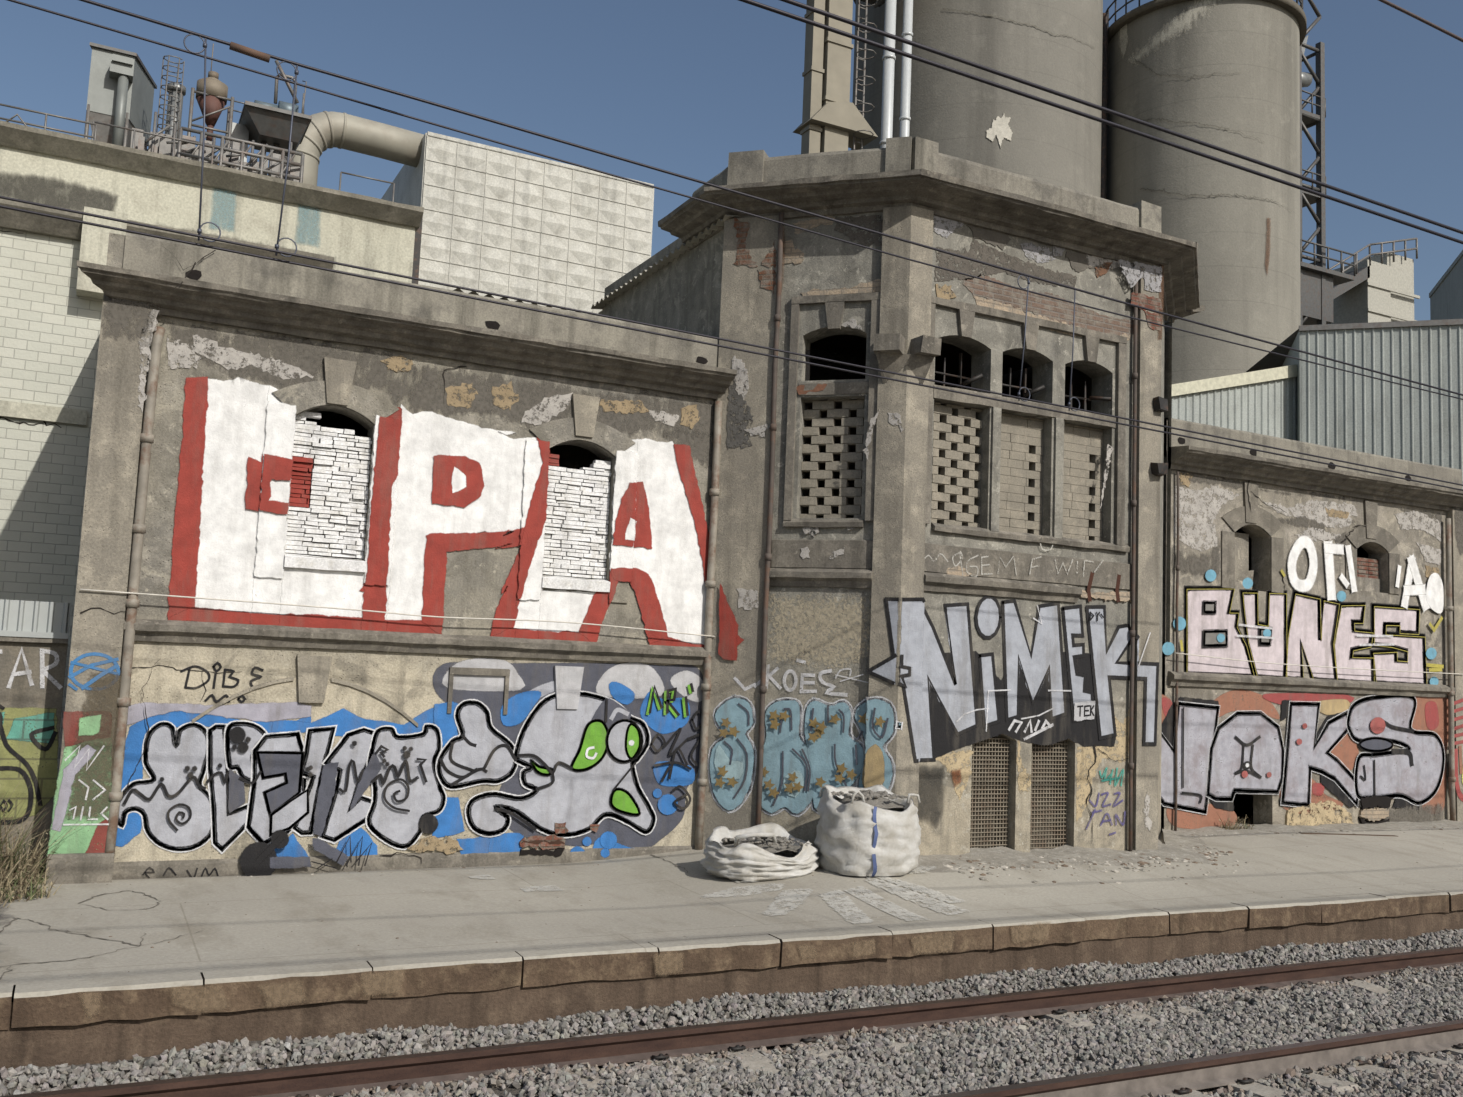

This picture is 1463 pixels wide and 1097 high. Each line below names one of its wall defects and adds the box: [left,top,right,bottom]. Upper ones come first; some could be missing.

peeling [986,113,1013,149]
flaking render [733,215,883,296]
peeling [933,215,1162,341]
spalling [841,319,862,330]
peeling [137,309,313,412]
spalling [381,355,413,372]
spalling [445,381,573,426]
spalling [600,399,700,429]
peeling [1173,472,1239,552]
peeling [1263,499,1358,542]
peeling [1394,510,1442,579]